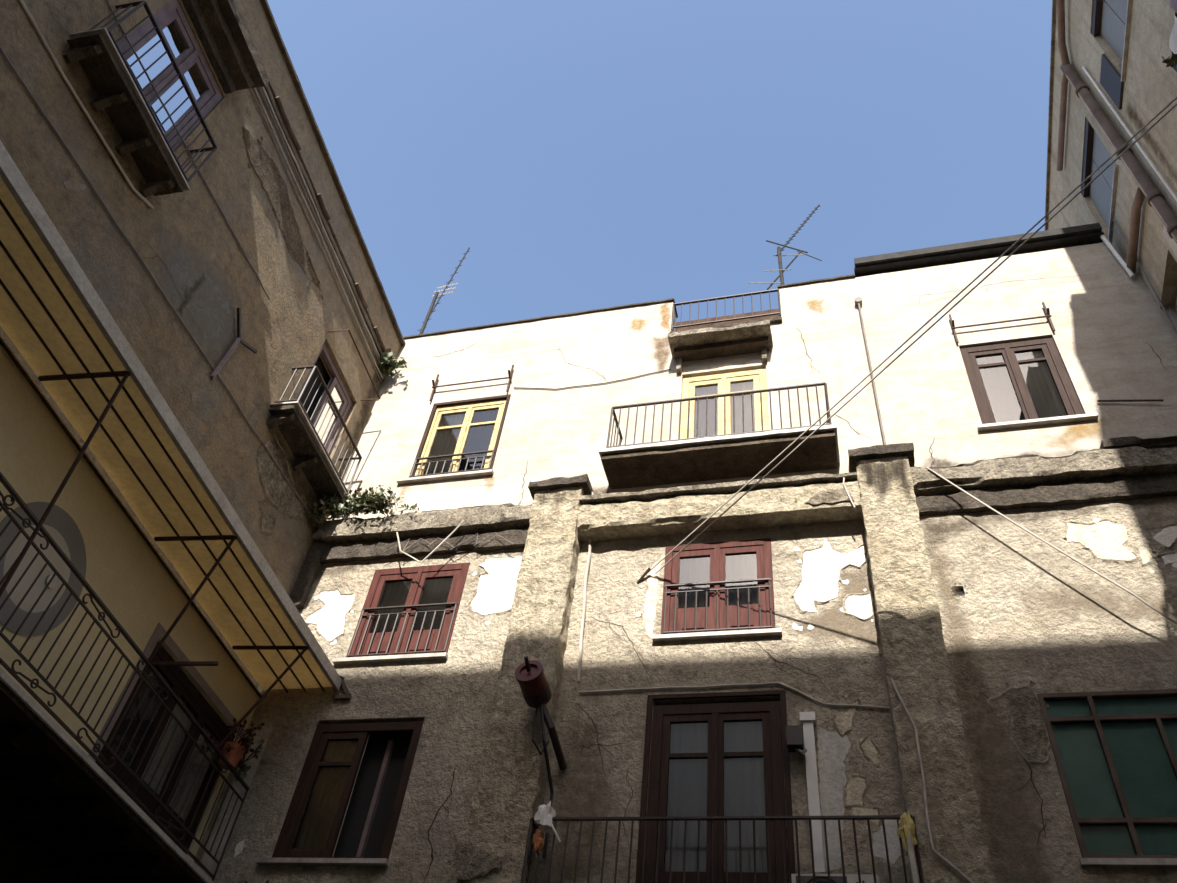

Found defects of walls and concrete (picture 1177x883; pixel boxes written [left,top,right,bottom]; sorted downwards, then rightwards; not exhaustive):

peeling [1063,518,1177,573]
peeling [304,587,356,645]
peeling [469,556,522,625]
peeling [791,538,875,631]
spalling [822,694,883,766]
crack [423,767,456,883]
spalling [842,773,882,832]
crack [1011,757,1046,847]